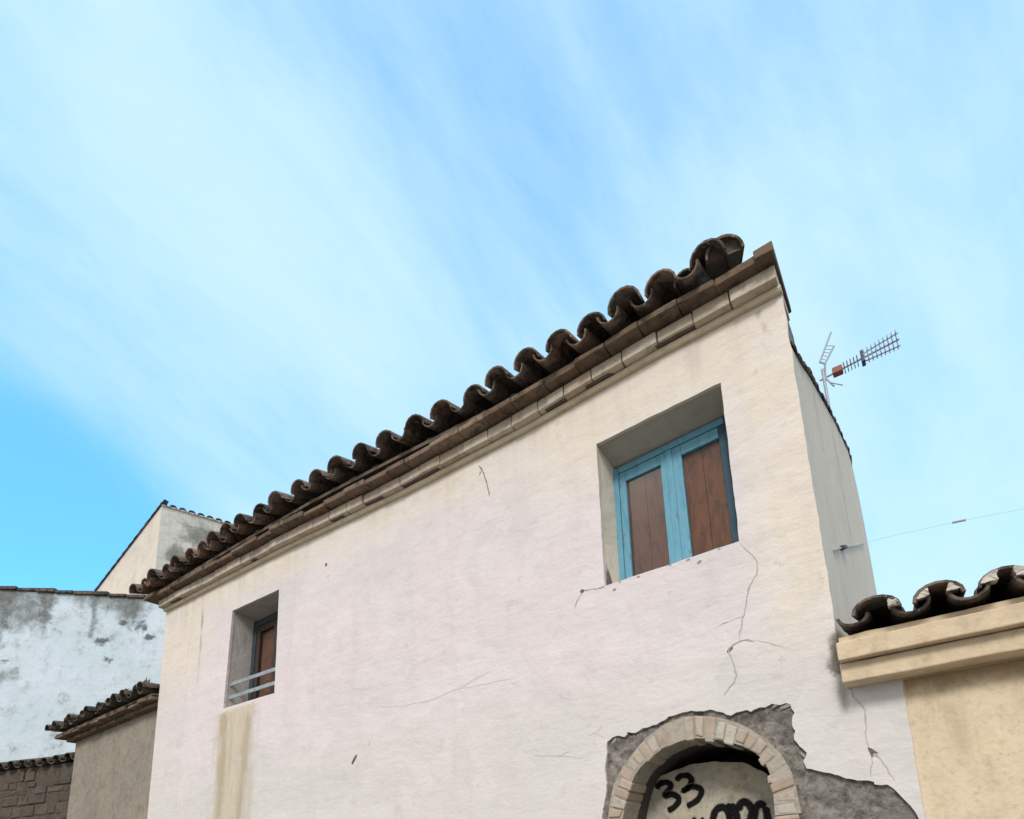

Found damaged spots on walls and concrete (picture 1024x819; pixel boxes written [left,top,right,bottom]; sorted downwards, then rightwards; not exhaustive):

damp [0,590,54,628]
damp [75,595,144,630]
crack [722,544,783,693]
damp [217,705,253,819]
spalling [603,703,919,819]
crack [851,688,894,779]